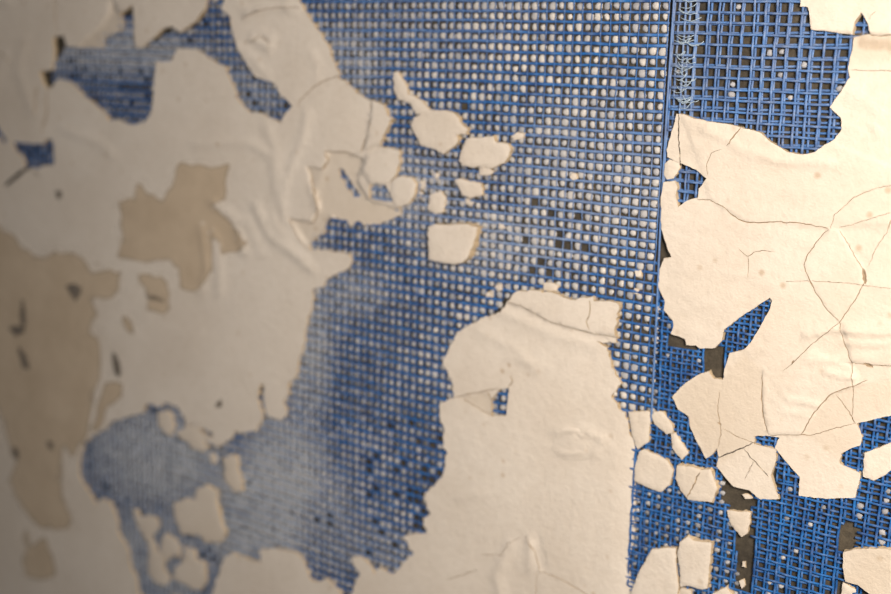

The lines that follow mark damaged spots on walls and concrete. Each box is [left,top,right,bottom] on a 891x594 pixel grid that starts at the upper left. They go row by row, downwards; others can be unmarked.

peeling [43,0,292,124]
peeling [0,132,54,168]
peeling [117,163,247,291]
peeling [139,274,169,314]
peeling [219,0,891,594]
crack [698,185,891,436]
peeling [0,227,122,530]
crack [717,377,777,476]
peeling [80,403,245,594]